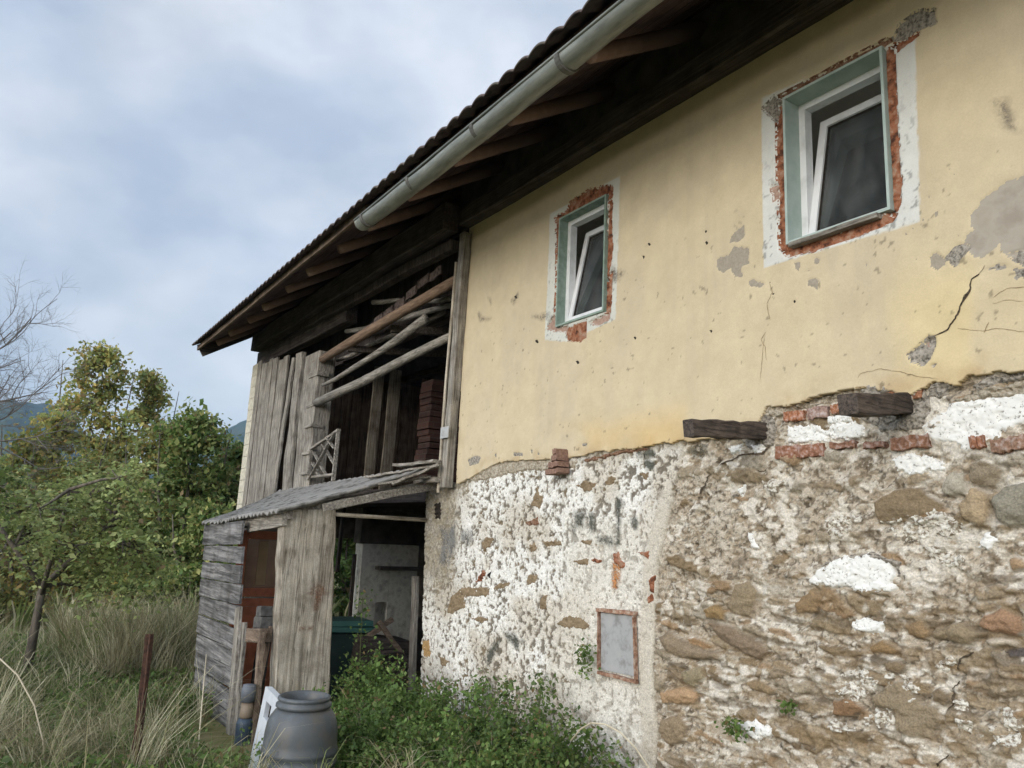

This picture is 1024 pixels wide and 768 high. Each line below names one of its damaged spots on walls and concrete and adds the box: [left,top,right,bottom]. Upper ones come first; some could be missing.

peeling [717,225,774,295]
crack [936,267,1023,335]
spalling [547,312,611,343]
spalling [906,334,937,368]
peeling [728,372,1024,476]
peeling [878,508,965,570]
peeling [809,552,899,593]
peeling [852,618,886,635]
peeling [835,667,921,703]
peeling [739,718,773,743]
peeling [827,706,895,733]
peeling [953,698,1024,748]